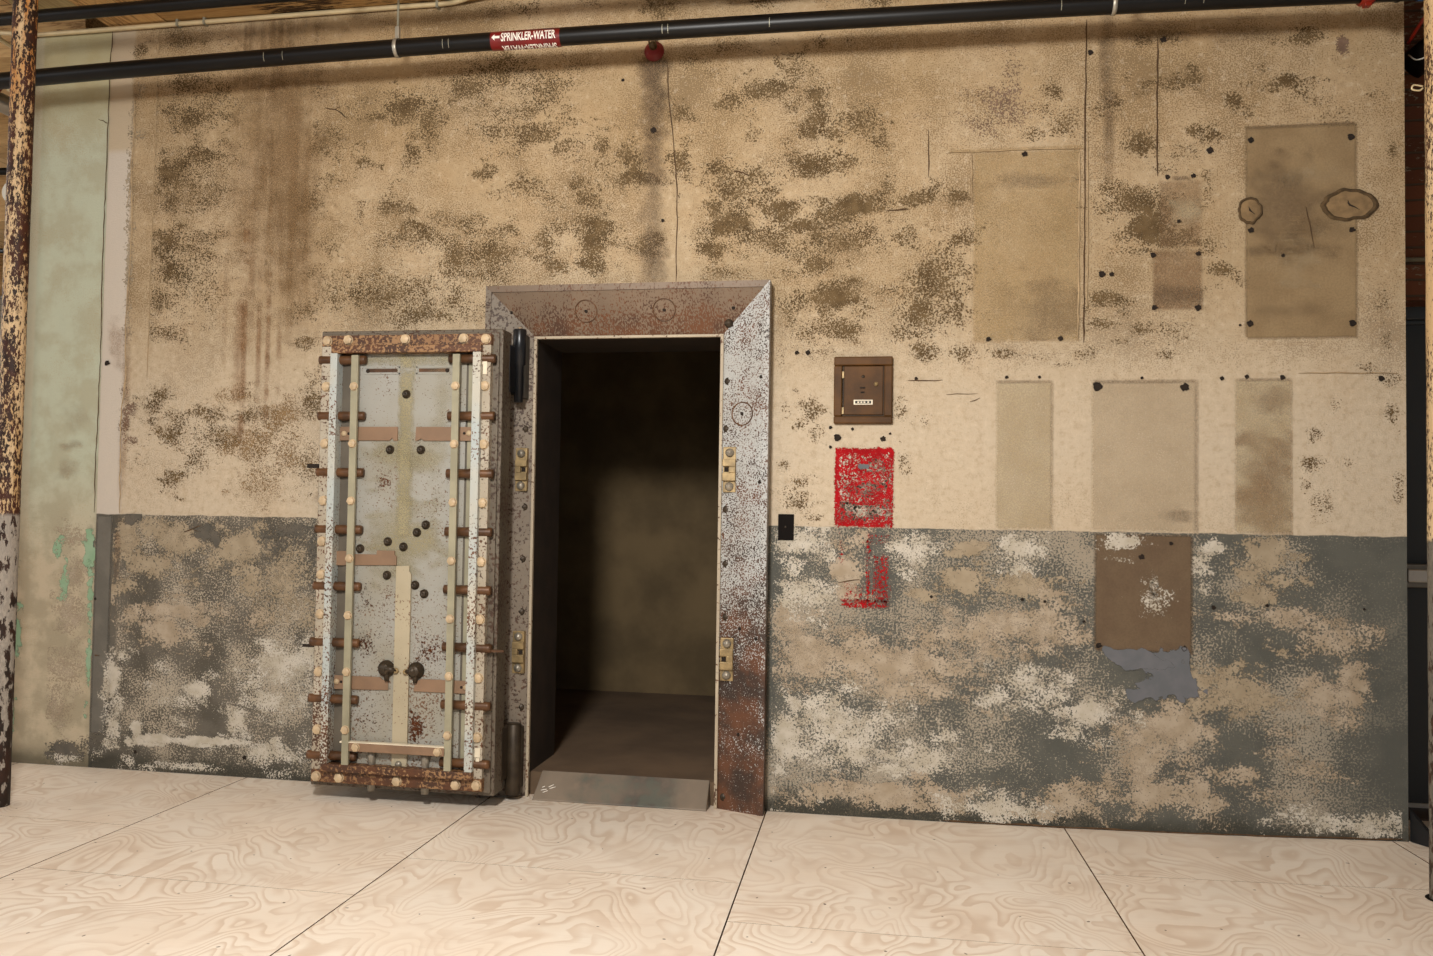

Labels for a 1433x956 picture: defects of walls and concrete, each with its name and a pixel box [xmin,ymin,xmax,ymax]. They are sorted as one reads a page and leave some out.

peeling [946,33,1379,338]
peeling [1268,25,1329,48]
peeling [43,31,1194,779]
peeling [1300,425,1356,523]
peeling [1356,362,1402,432]
peeling [770,461,1402,842]